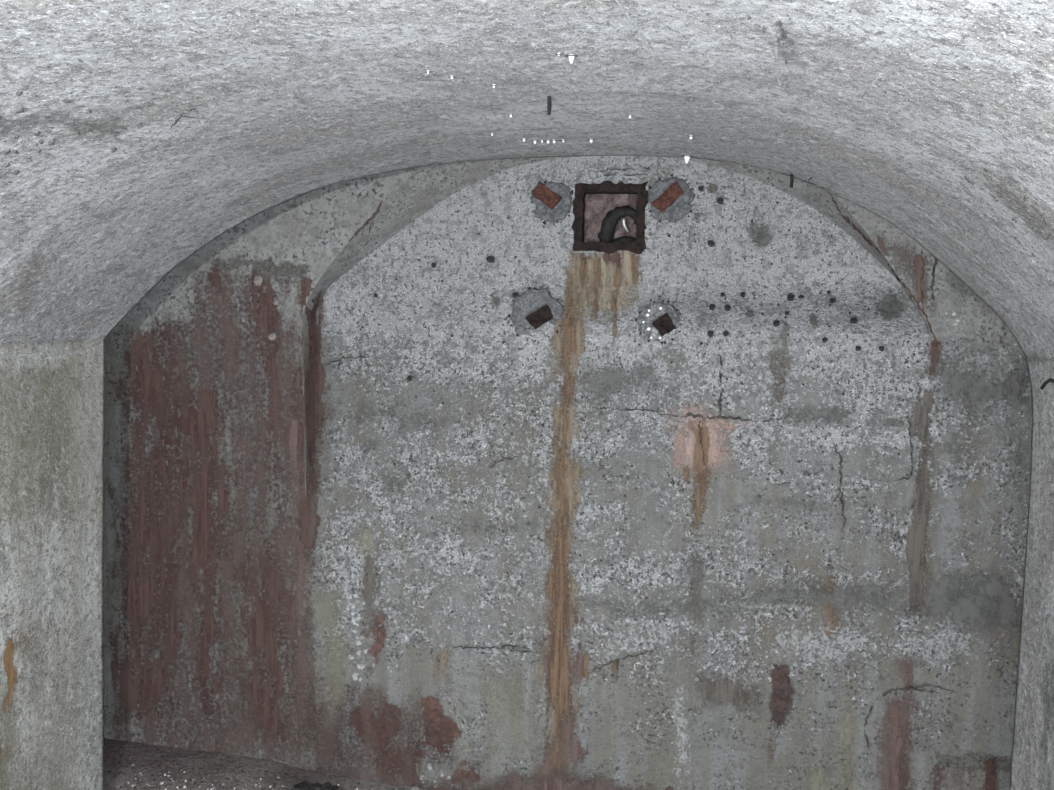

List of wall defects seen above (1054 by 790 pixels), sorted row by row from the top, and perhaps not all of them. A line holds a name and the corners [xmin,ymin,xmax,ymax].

rust [878,237,929,304]
rust [928,341,940,378]
rust [109,250,639,790]
rust [673,407,736,527]
rust [907,391,933,617]
rust [3,634,30,708]
rust [878,655,918,790]